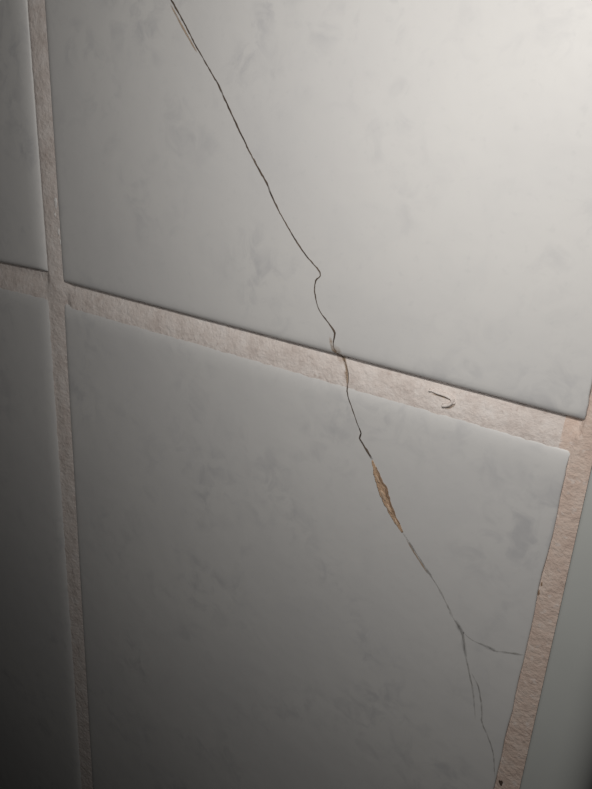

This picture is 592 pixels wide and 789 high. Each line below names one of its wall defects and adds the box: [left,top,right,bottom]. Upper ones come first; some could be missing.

crack [171,0,371,457]